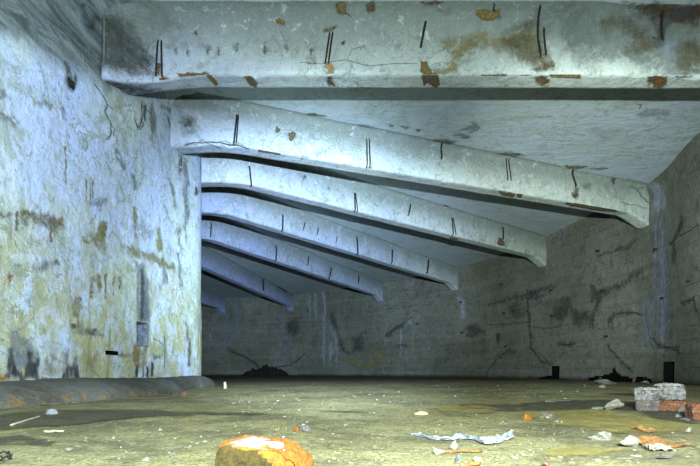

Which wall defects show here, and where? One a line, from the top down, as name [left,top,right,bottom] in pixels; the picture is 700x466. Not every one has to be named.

crack [94,83,115,140]
water stain [88,1,177,74]
crack [301,46,415,66]
spalling [421,60,440,88]
rust [444,10,555,88]
rust [648,76,667,89]
water stain [169,163,190,244]
water stain [121,230,181,320]
water stain [8,331,39,380]
crack [486,286,589,375]
spalling [588,366,652,383]
crack [607,298,700,371]